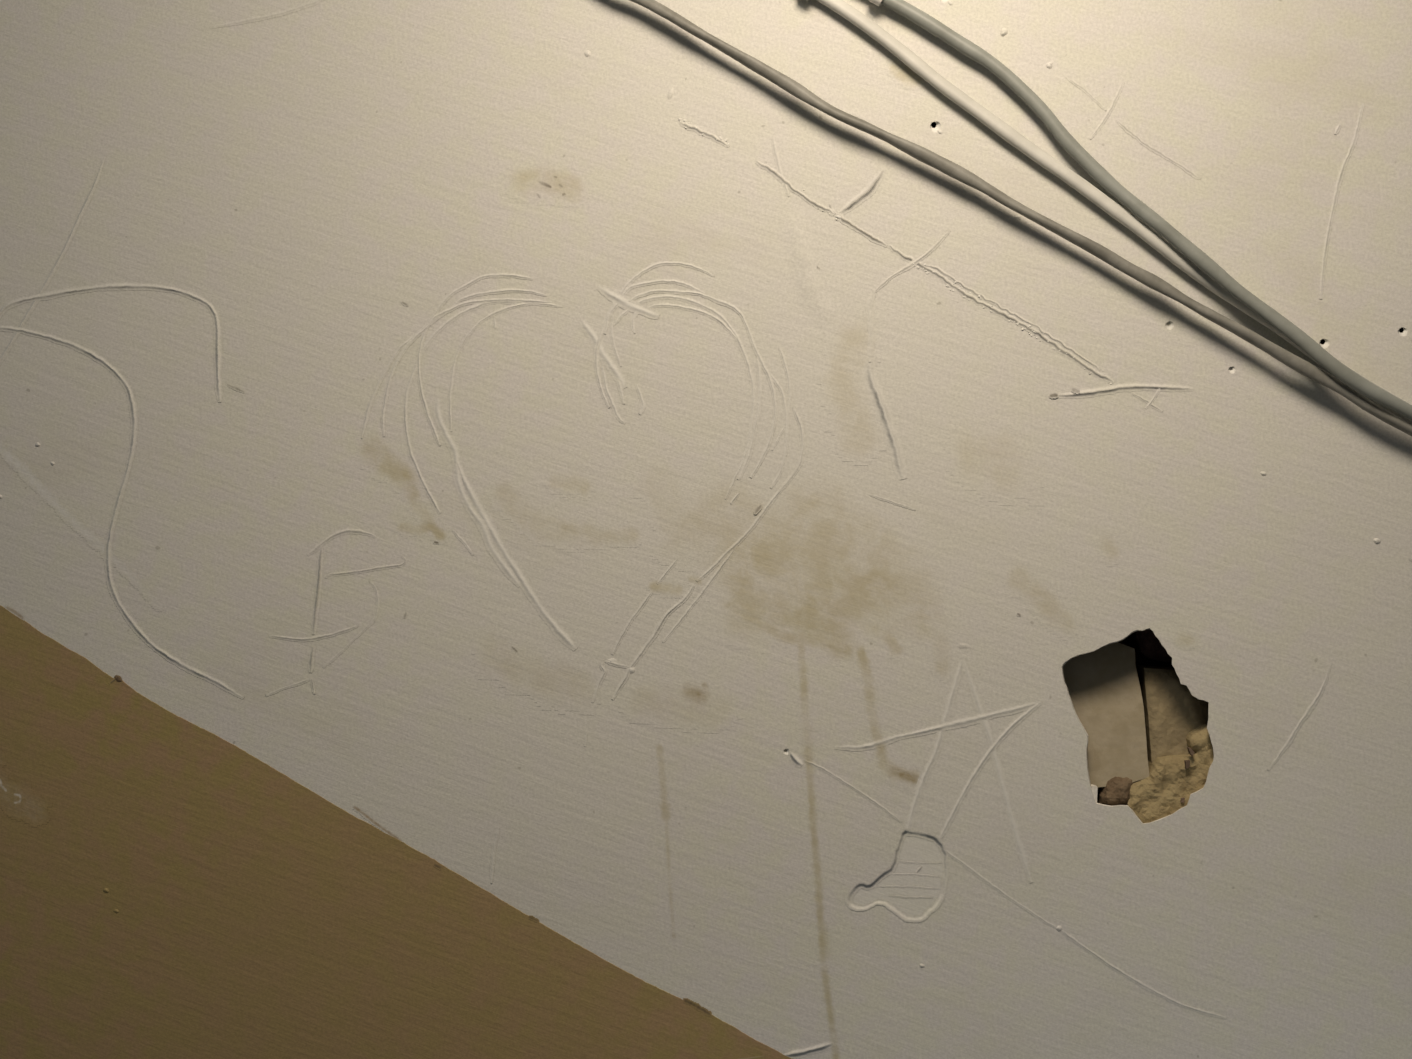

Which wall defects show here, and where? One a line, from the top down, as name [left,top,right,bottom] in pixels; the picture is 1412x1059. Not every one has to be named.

water stain [471,626,601,715]
water stain [646,457,957,1059]
spalling [1062,628,1214,824]